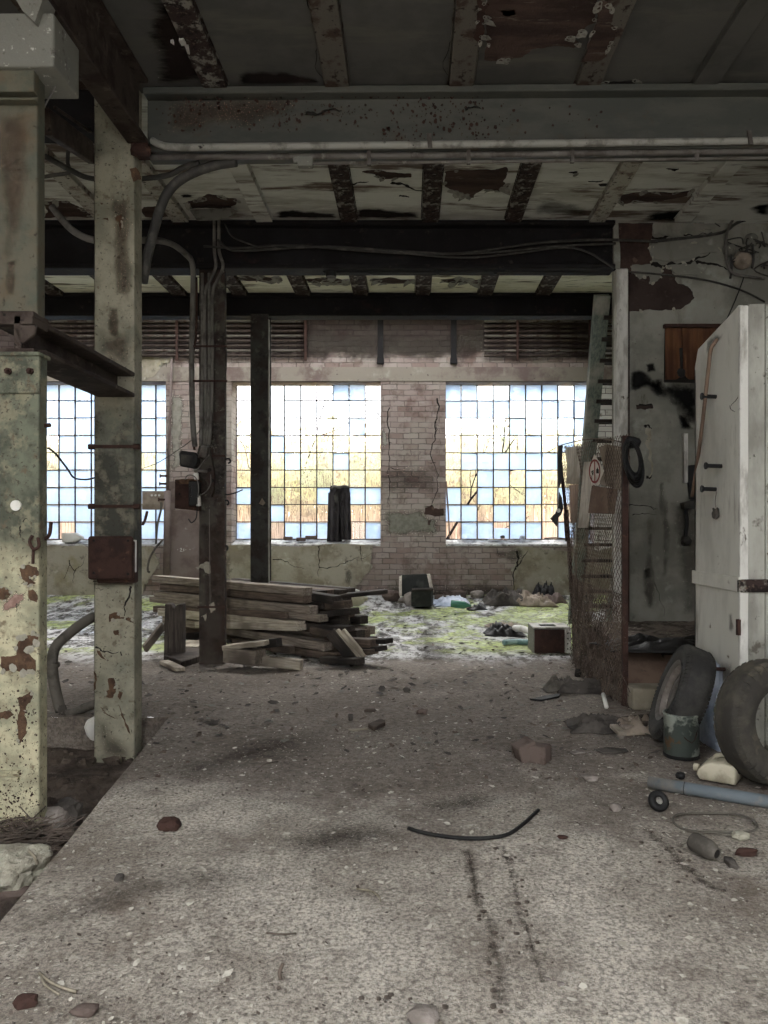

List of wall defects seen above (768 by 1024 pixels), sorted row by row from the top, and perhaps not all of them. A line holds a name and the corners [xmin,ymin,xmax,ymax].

peeling [473,0,618,65]
rust [156,97,526,141]
peeling [442,167,510,201]
peeling [618,189,695,206]
peeling [618,223,722,313]
crack [430,398,440,503]
crack [273,546,365,577]
crack [512,551,528,590]
peeling [0,631,40,678]
peeling [0,690,34,743]